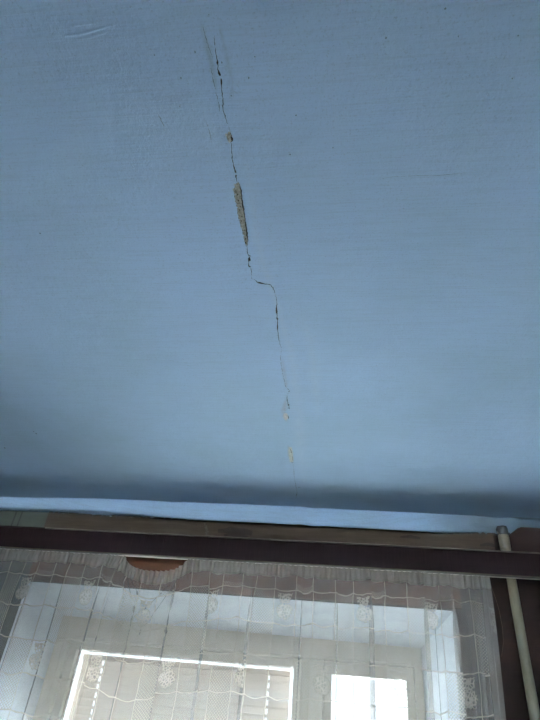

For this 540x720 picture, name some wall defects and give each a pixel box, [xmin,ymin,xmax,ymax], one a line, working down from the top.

crack [203,28,237,181]
flaking render [233,183,248,245]
crack [247,250,290,409]